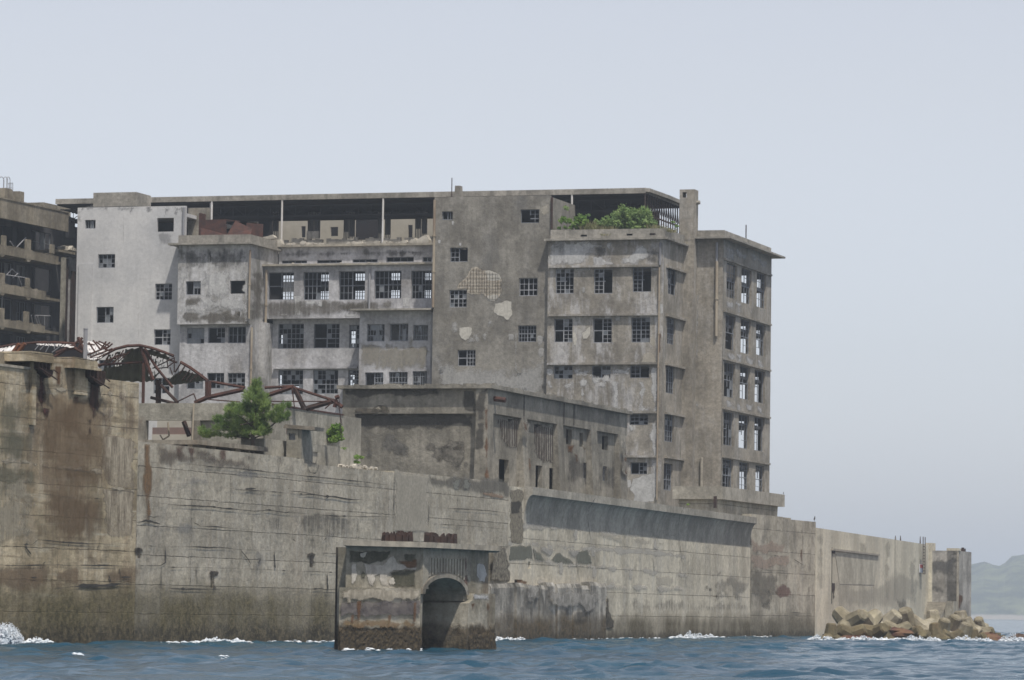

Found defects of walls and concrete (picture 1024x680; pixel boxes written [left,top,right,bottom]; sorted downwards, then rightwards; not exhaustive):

flaking render [457,267,512,320]
flaking render [459,327,472,340]
water stain [101,391,138,537]
rust [143,444,152,516]
rust [381,530,457,544]
peeling [351,552,416,585]